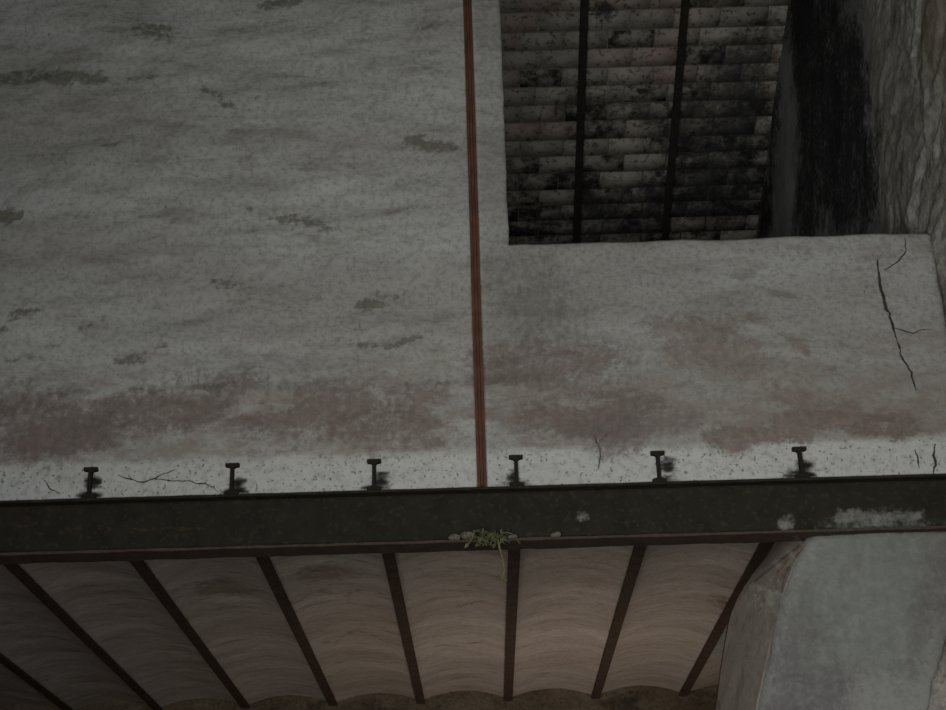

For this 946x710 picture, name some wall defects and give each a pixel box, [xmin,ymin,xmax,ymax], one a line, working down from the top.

leakage [580,0,882,242]
crack [877,238,928,389]
leakage [703,386,918,452]